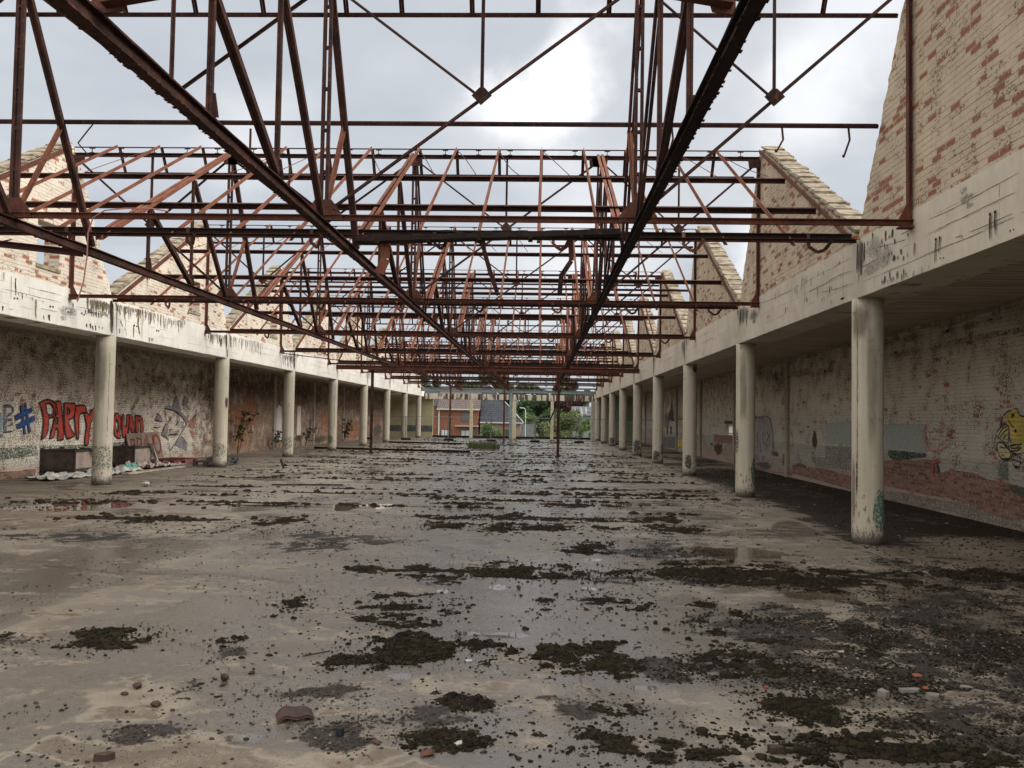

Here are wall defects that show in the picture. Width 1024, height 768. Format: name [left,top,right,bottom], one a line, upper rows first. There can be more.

leakage [856,229,941,285]
leakage [73,298,185,342]
leakage [210,334,263,357]